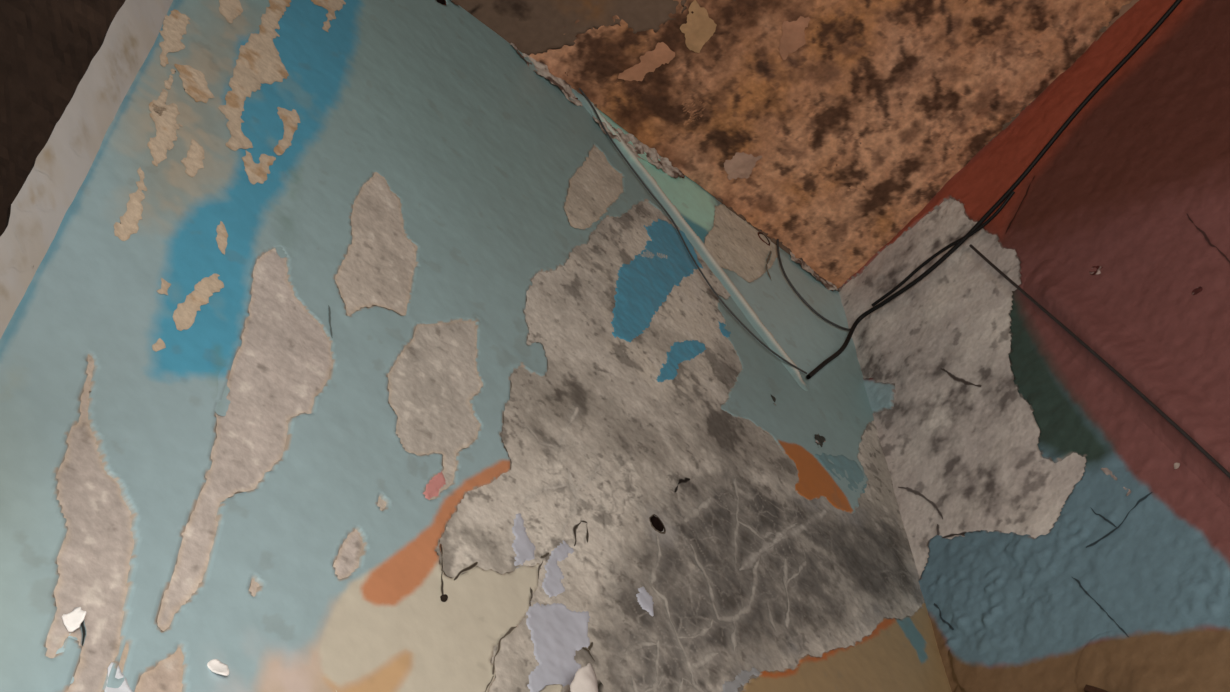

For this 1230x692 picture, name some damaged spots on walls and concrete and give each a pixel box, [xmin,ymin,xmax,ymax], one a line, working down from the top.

peeling [311,0,346,33]
peeling [114,0,300,241]
peeling [216,221,228,255]
peeling [335,172,417,316]
peeling [152,338,166,352]
peeling [157,248,333,631]
peeling [388,320,483,500]
flaking render [436,0,1139,692]
peeling [46,354,184,692]
peeling [333,529,364,579]
peeling [207,659,229,676]